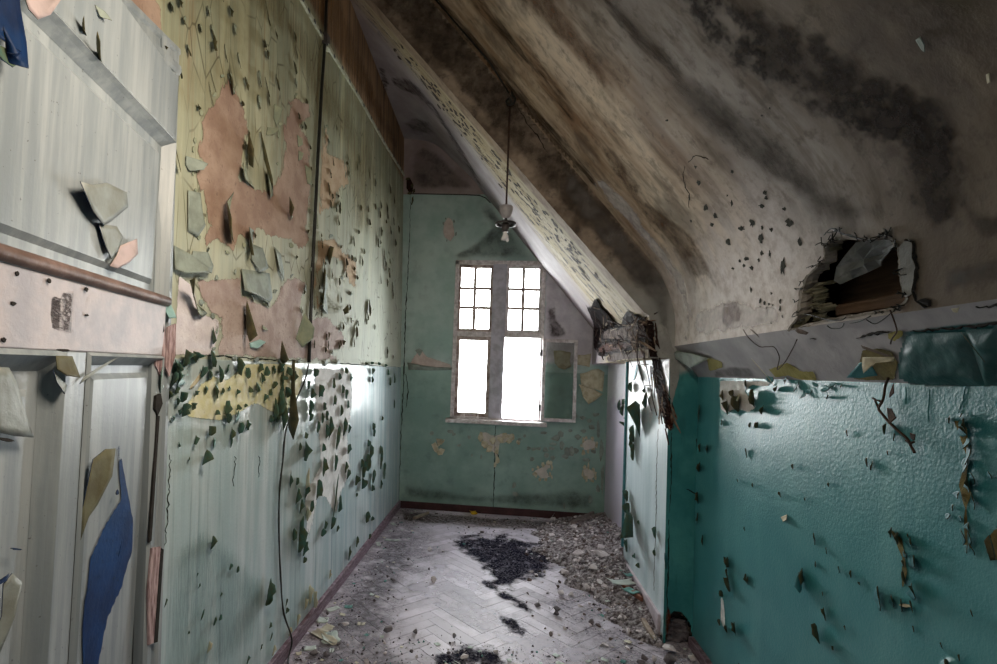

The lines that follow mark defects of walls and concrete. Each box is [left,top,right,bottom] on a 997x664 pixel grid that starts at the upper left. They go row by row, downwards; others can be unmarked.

peeling [0,0,60,69]
peeling [82,17,102,62]
damp [690,0,963,224]
peeling [80,181,138,268]
peeling [160,5,386,563]
flaking render [750,233,915,337]
peeling [0,367,34,442]
peeling [53,349,117,394]
spalling [429,299,681,503]
peeling [719,330,903,428]
peeling [81,447,133,664]
peeling [620,490,640,576]